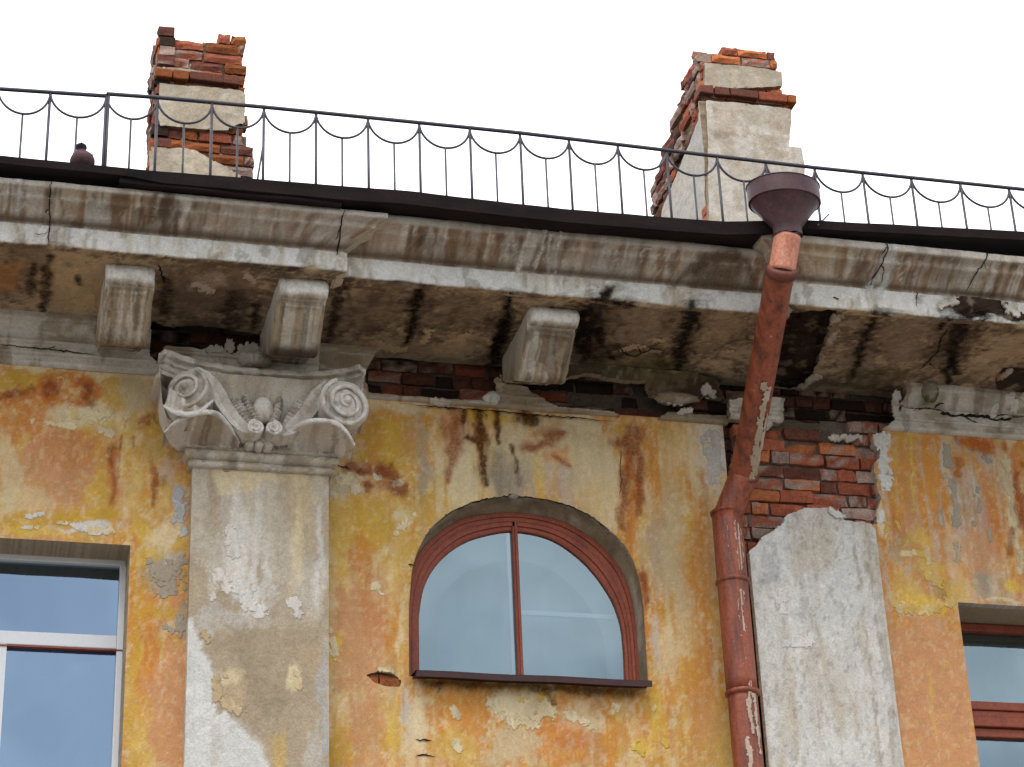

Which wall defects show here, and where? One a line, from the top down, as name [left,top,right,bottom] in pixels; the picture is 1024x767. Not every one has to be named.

crack [37,181,52,244]
crack [336,211,345,254]
crack [868,242,889,288]
damp [488,292,513,365]
damp [574,286,701,371]
spalling [365,326,506,407]
damp [461,410,518,486]
damp [517,410,539,426]
spalling [723,297,903,636]
crack [905,403,1023,423]
spalling [368,665,401,687]
peeling [486,691,595,731]